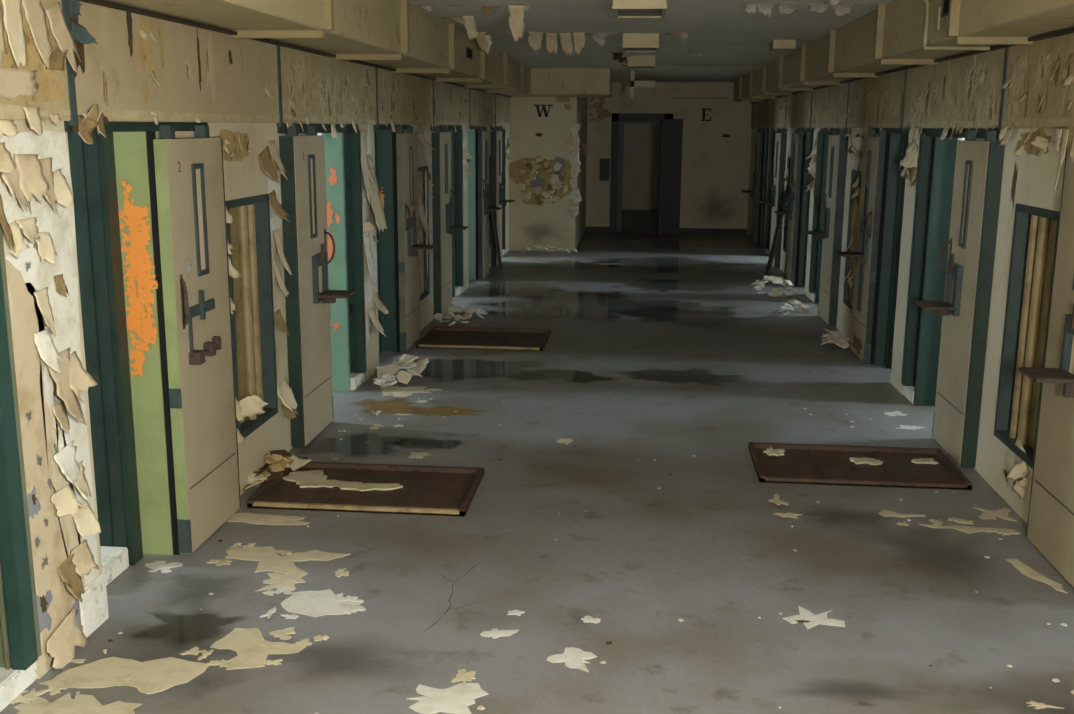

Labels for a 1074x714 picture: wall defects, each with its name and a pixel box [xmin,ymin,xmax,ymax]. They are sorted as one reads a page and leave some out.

peeling [0,0,638,669]
peeling [63,694,142,714]